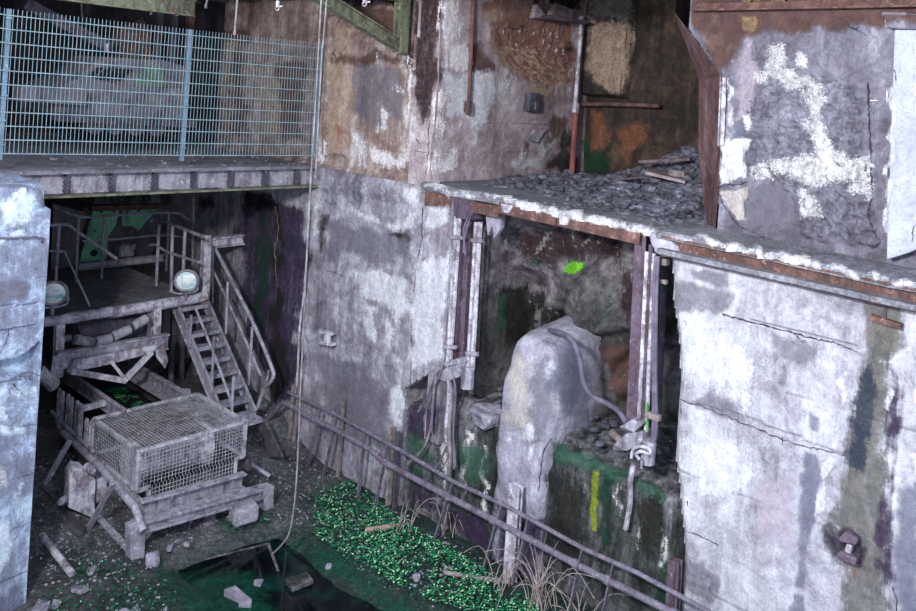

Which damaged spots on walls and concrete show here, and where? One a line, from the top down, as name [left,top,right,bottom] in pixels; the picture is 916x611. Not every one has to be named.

rust [482,0,577,85]
rust [691,0,916,76]
leakage [351,56,416,169]
leakage [425,0,511,199]
rust [590,111,648,161]
crack [867,82,879,249]
leakage [487,194,656,236]
leakage [233,187,443,449]
peeling [675,270,730,313]
crack [722,313,855,352]
crack [680,399,845,456]
leakage [814,301,916,611]